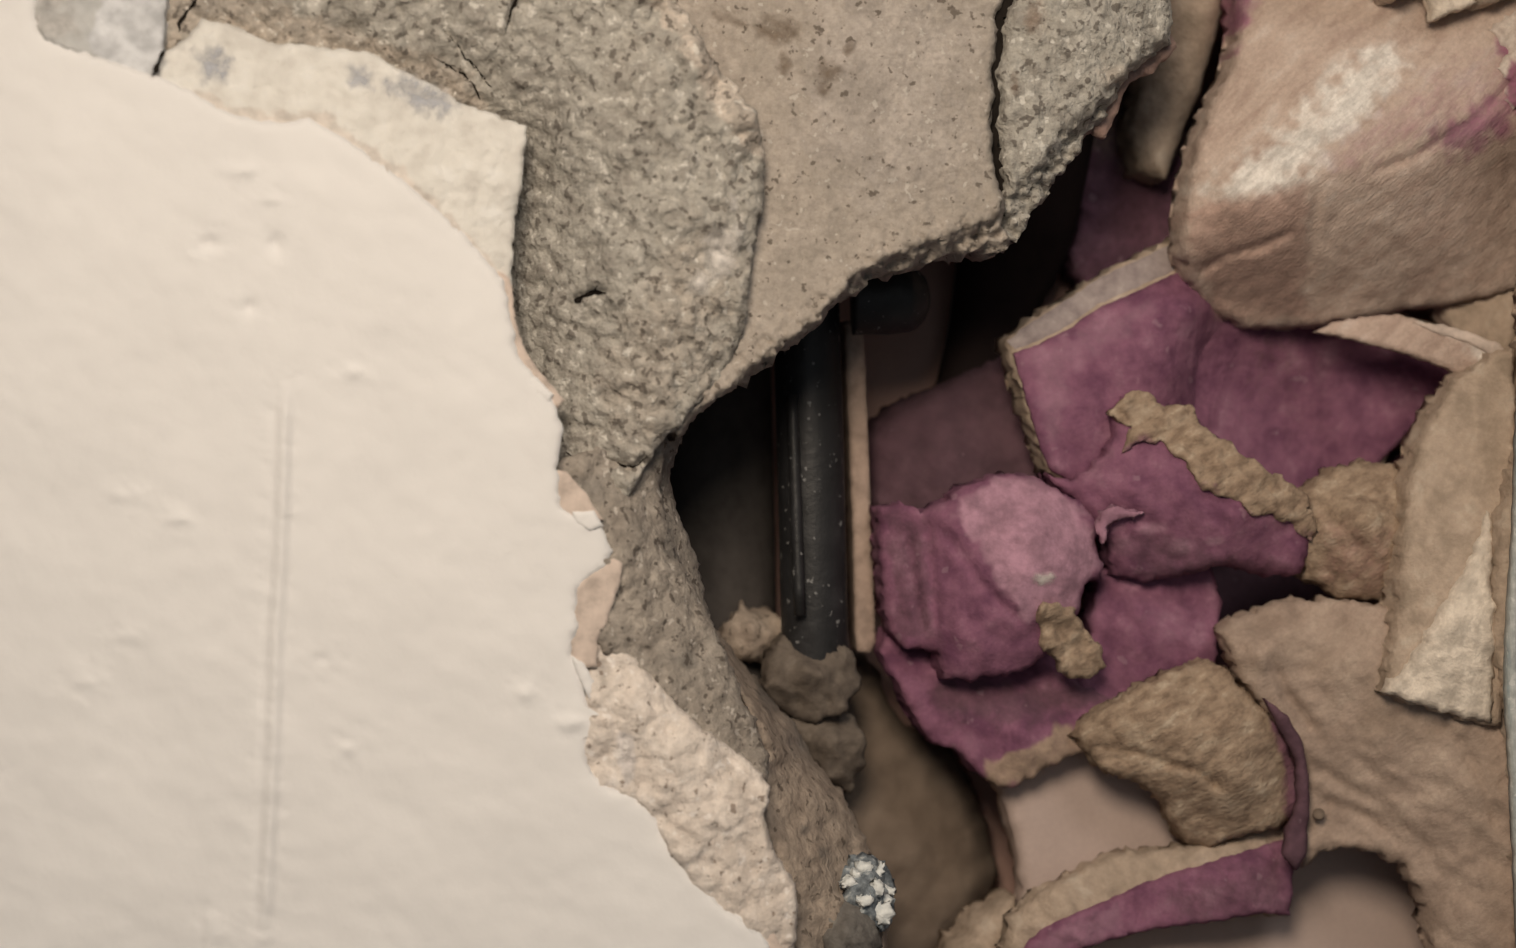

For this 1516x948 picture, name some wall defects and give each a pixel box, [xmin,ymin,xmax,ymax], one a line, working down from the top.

crack [434,28,492,99]
crack [505,0,518,32]
crack [988,0,1014,216]
peeling [1422,0,1477,24]
spalling [35,0,1010,948]
spalling [1379,511,1497,723]